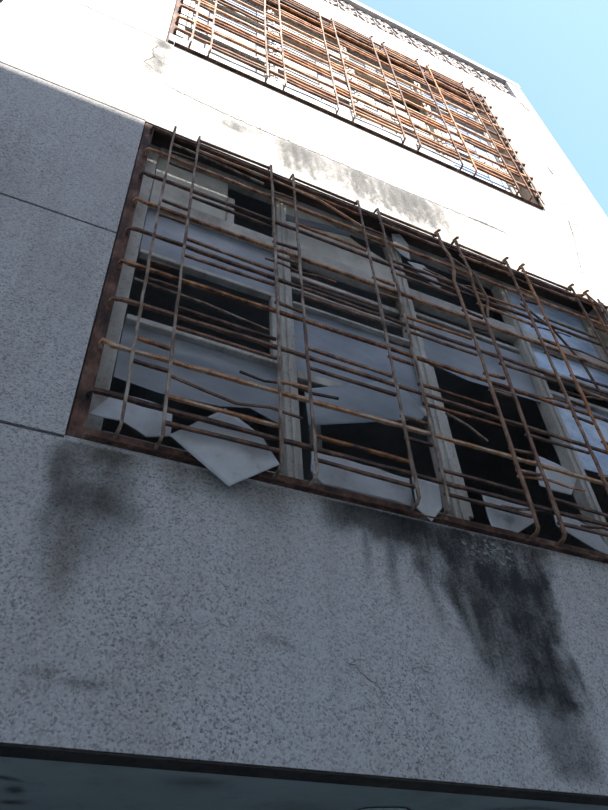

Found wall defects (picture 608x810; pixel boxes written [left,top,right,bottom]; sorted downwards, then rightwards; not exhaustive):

water stain [279,141,322,179]
crack [139,45,511,236]
water stain [338,163,449,228]
water stain [50,444,130,517]
water stain [325,500,589,774]
crack [346,659,390,706]